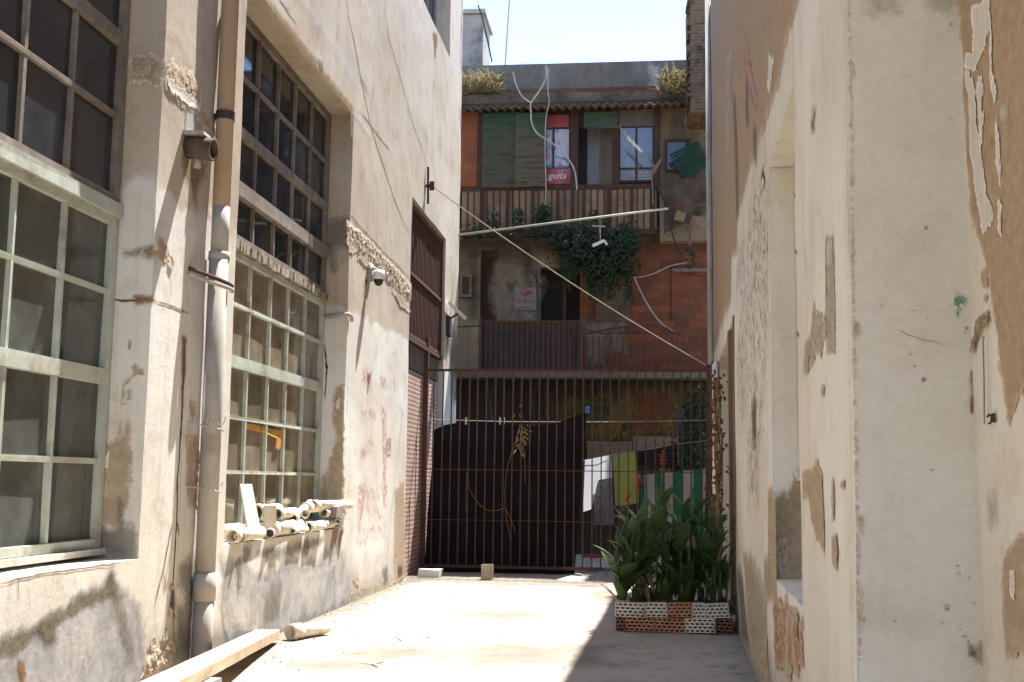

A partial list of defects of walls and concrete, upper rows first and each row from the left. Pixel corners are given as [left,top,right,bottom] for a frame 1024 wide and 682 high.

flaking render [127,50,216,144]
peeling [950,0,1024,427]
peeling [710,0,866,682]
peeling [102,421,133,530]
peeling [320,384,346,500]
peeling [1001,532,1024,660]